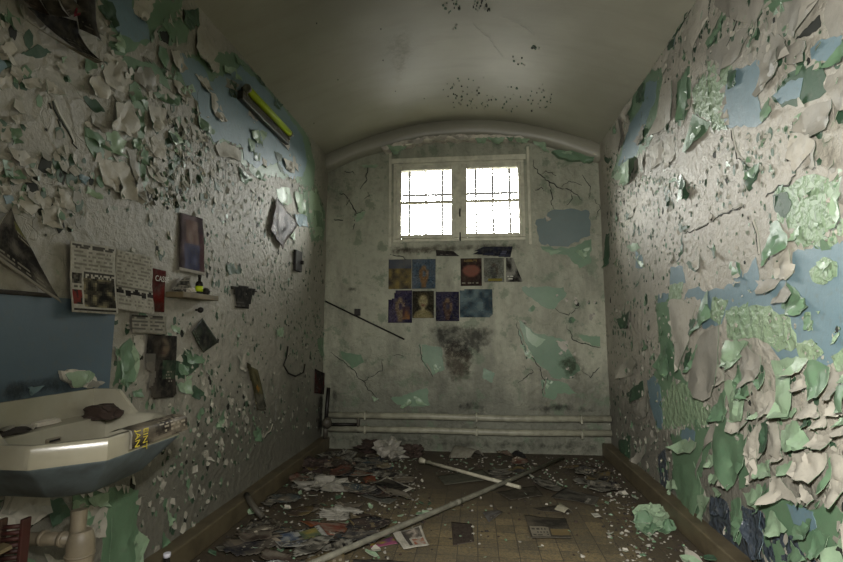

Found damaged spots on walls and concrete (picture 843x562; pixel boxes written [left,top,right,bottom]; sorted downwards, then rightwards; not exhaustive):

peeling [0,0,383,562]
leakage [438,327,486,375]
peeling [516,0,843,562]